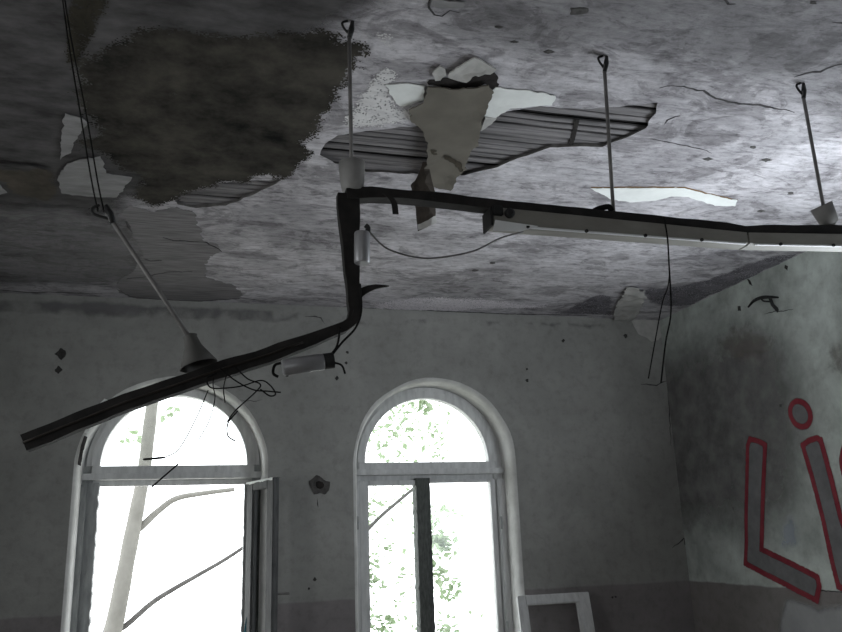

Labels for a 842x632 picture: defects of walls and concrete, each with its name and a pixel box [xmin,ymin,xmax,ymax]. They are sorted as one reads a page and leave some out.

crack [428,0,459,17]
peeling [57,113,132,198]
flaking render [116,179,281,302]
damp [64,0,371,208]
peeling [415,206,436,231]
flaking render [320,57,657,192]
peeling [591,186,738,206]
crack [661,86,795,113]
damp [664,344,792,524]
peeling [780,600,842,632]